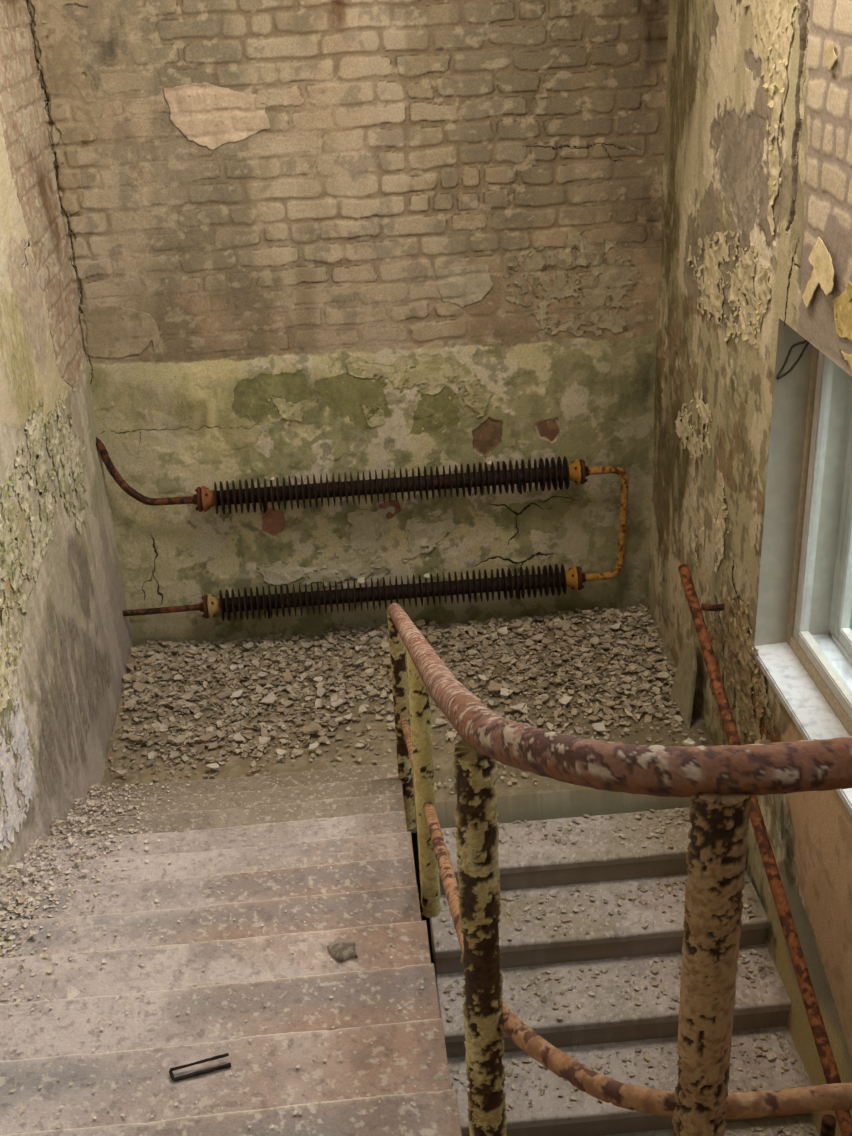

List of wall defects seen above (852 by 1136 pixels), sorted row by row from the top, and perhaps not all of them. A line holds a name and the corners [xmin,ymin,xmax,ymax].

crack [26,0,83,313]
peeling [163,82,270,150]
peeling [687,0,800,350]
peeling [802,237,852,370]
flaking render [0,0,160,712]
spalling [534,417,561,444]
peeling [675,391,713,464]
crack [142,533,163,615]
crack [476,496,575,574]
peeling [690,473,730,573]